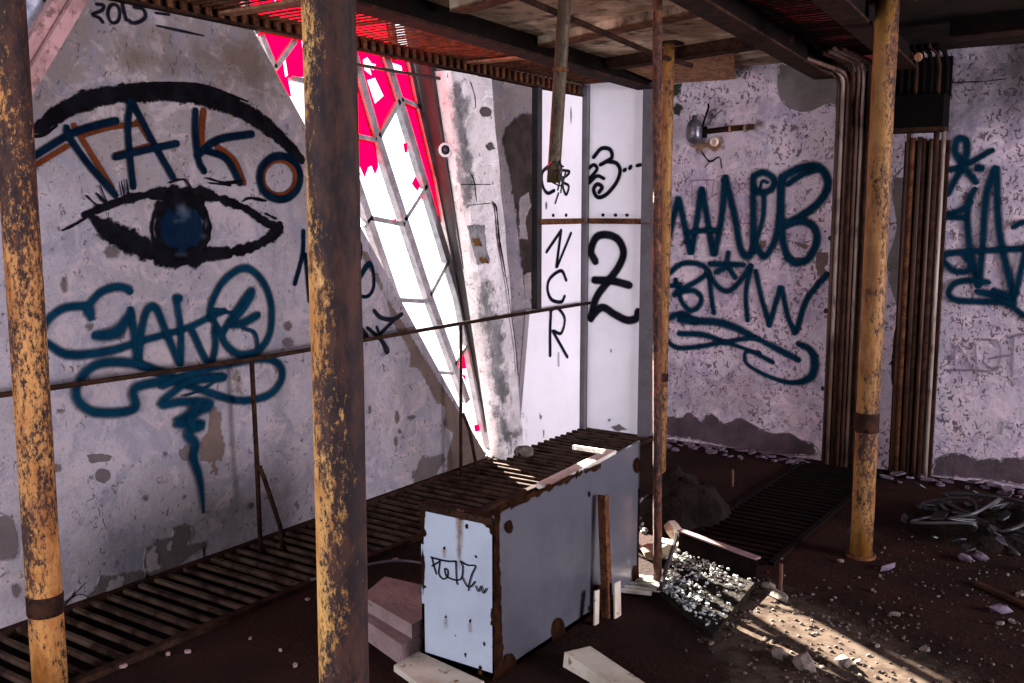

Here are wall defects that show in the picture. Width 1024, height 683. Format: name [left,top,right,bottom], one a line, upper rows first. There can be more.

leakage [451,80,475,210]
leakage [502,113,532,303]
leakage [479,280,523,454]
spalling [180,406,225,476]
spalling [667,412,820,456]
spalling [932,453,1024,486]